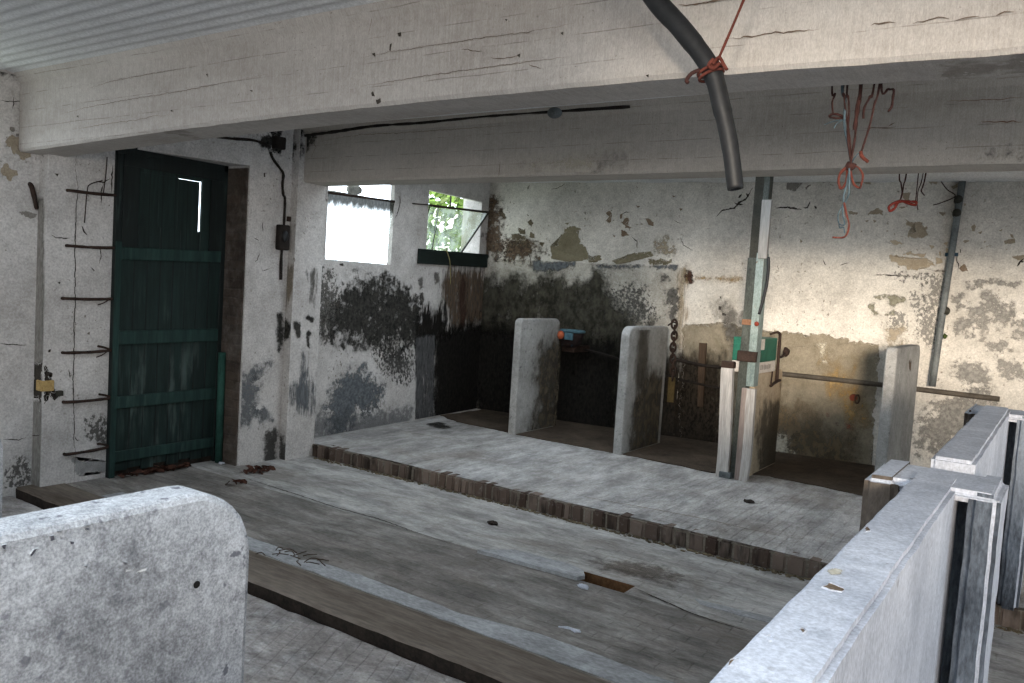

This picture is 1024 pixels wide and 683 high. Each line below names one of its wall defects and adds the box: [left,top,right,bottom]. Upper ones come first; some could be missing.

spalling [0,126,32,182]
crack [717,189,752,216]
damp [532,260,576,272]
peeling [504,212,673,266]
peeling [886,192,949,271]
peeling [999,229,1024,261]
damp [240,266,474,461]